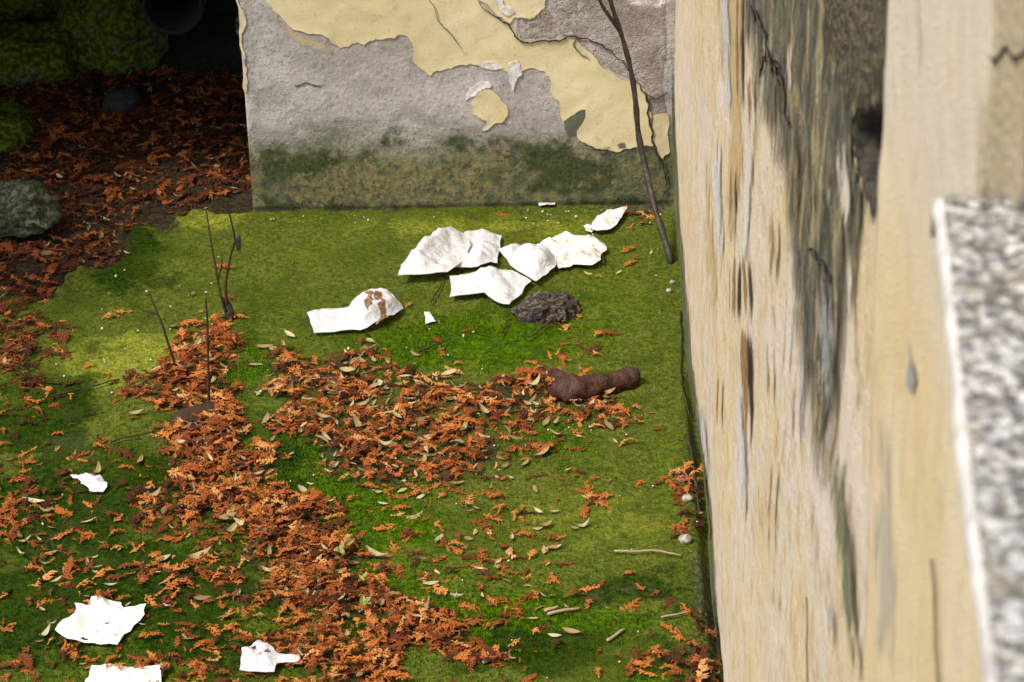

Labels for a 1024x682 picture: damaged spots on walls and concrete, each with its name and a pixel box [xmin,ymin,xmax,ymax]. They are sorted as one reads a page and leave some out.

peeling [243,0,586,139]
flaking render [479,0,667,117]
crack [750,5,791,125]
crack [989,45,1024,64]
leakage [819,296,835,404]